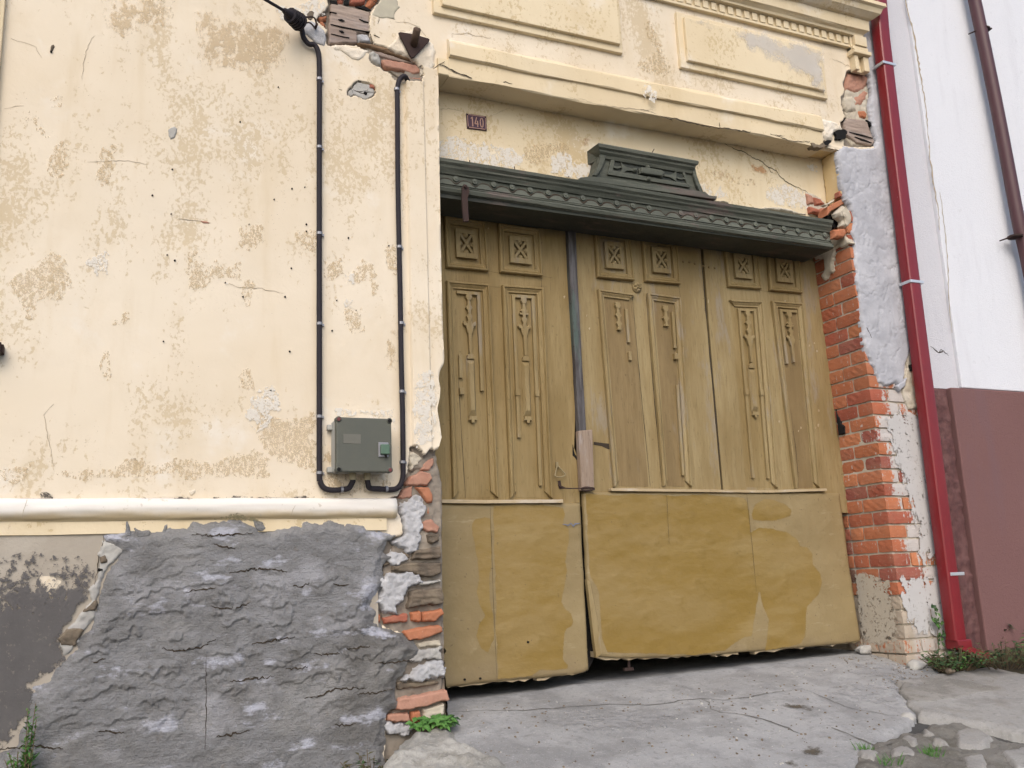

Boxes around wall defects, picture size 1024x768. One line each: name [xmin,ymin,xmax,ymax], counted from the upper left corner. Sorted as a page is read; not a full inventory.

flaking render [196,0,421,79]
flaking render [339,82,375,100]
crack [574,98,810,193]
flaking render [807,73,874,151]
peeling [894,349,917,410]
spalling [375,370,450,737]